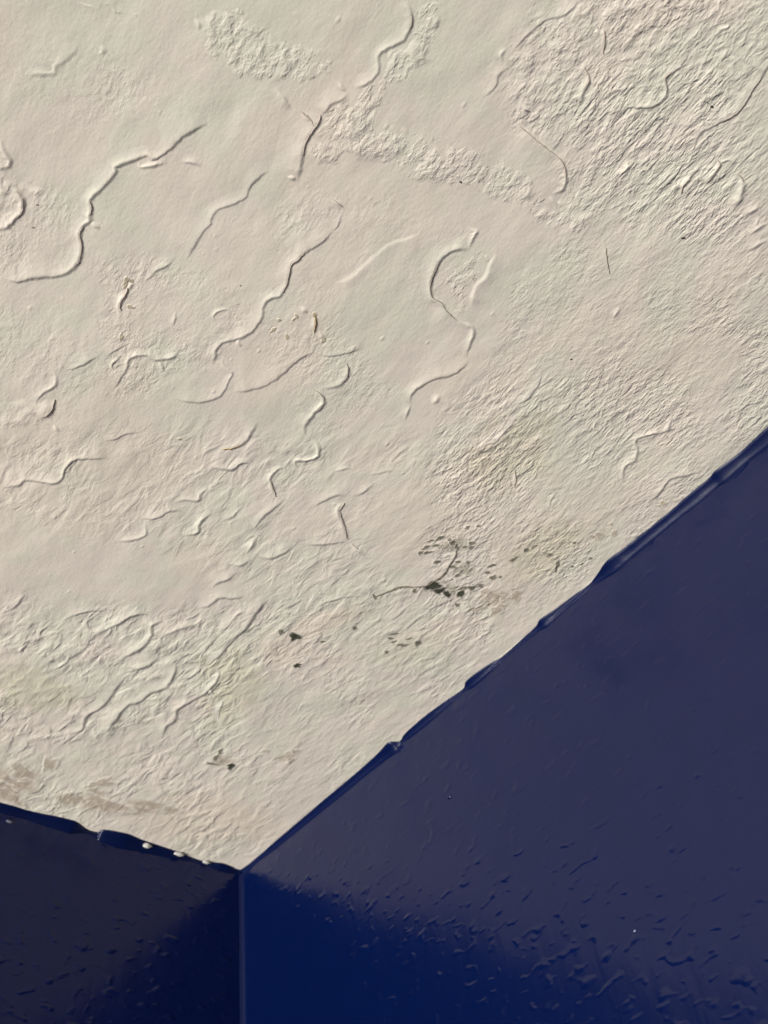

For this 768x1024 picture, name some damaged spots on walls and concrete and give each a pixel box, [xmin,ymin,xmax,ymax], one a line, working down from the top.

leakage [0,388,620,855]